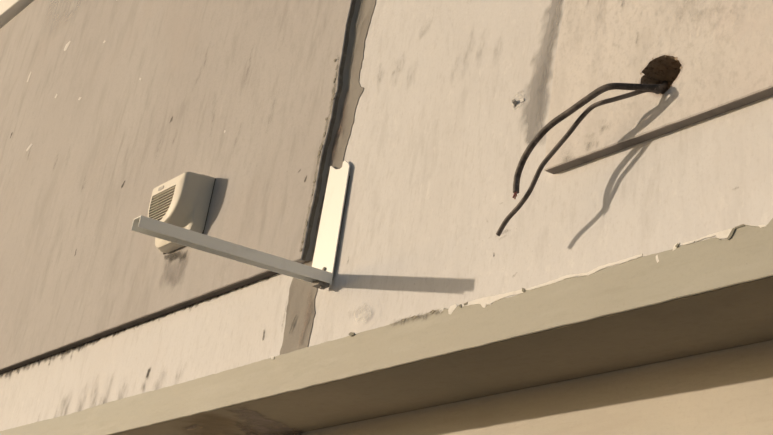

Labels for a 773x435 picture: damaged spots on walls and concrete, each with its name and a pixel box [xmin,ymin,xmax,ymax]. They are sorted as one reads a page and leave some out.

leakage [525,0,561,143]
spalling [673,224,745,251]
peeling [401,254,643,322]